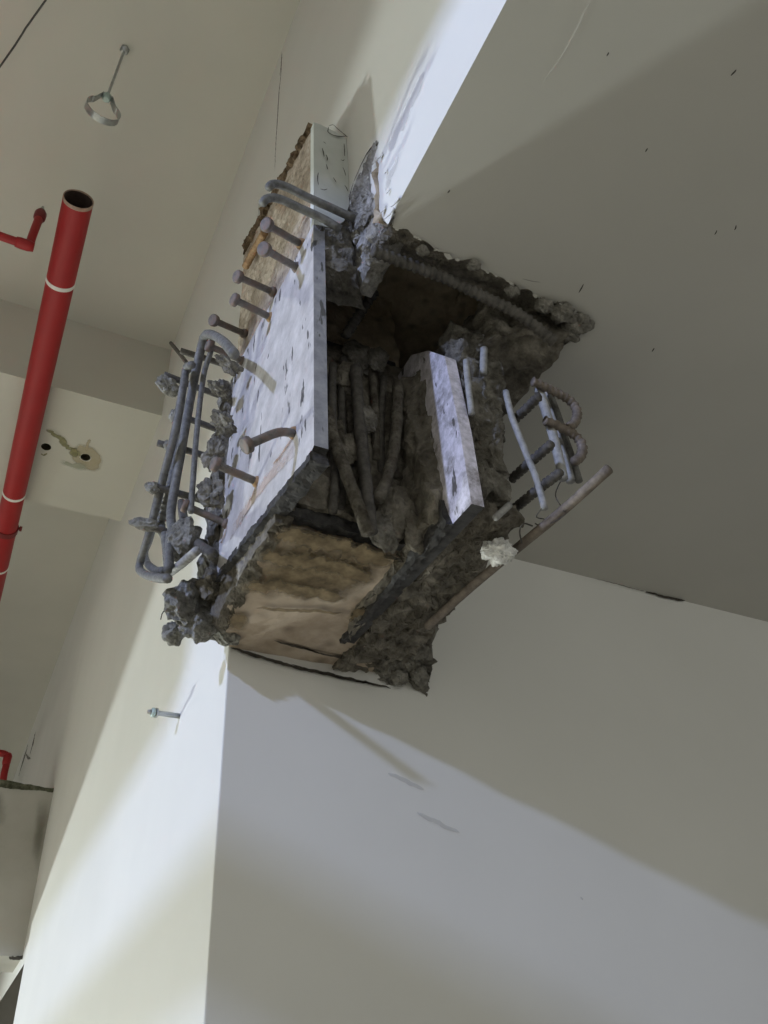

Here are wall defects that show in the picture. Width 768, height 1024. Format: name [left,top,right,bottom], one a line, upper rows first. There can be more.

spalling [259,141,595,346]
damp [47,430,100,470]
spalling [135,330,240,584]
spalling [328,355,404,537]
spalling [463,334,488,416]
spalling [492,387,613,556]
spalling [372,564,504,697]